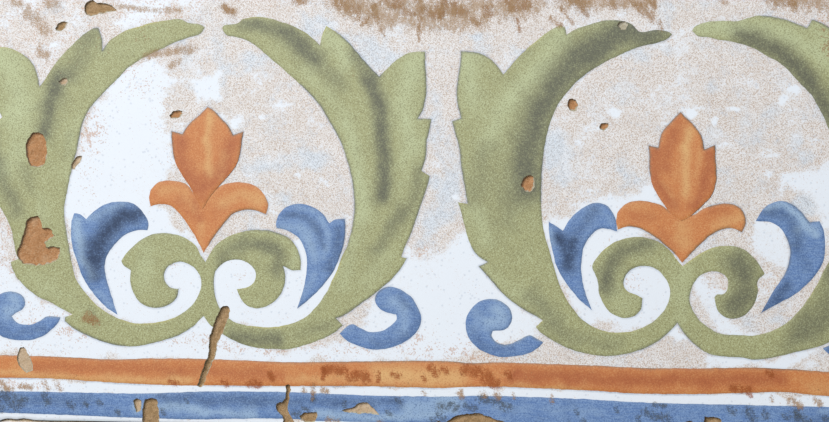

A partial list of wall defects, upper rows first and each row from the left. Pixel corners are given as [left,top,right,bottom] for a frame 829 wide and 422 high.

peeling [26,132,47,167]
peeling [17,216,60,266]
peeling [17,347,33,373]
crack [197,306,230,387]
peeling [133,398,159,422]
crack [276,384,294,422]
peeling [342,402,379,415]
peeling [435,413,504,422]